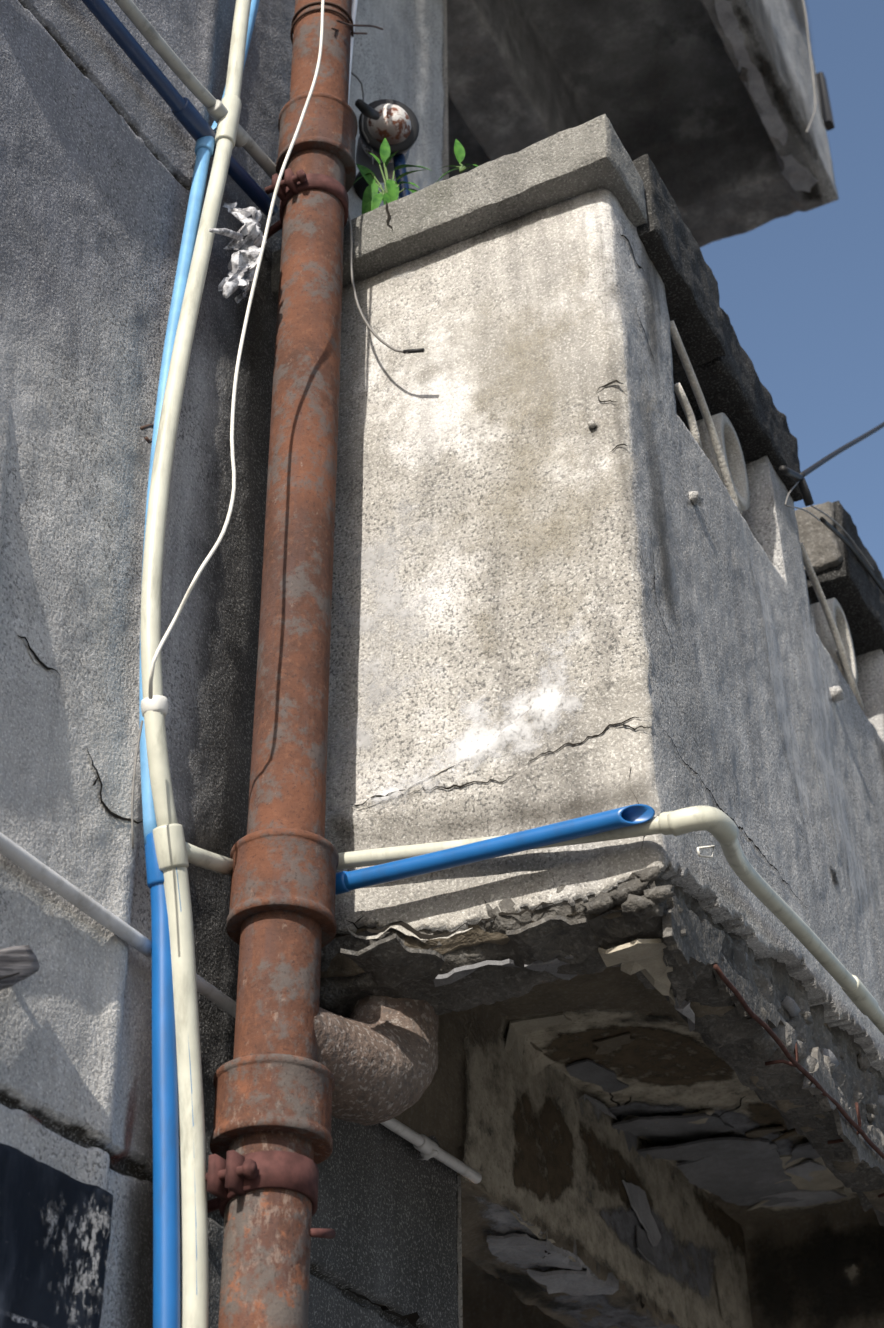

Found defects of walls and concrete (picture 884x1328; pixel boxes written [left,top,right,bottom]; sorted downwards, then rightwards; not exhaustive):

water stain [737,0,817,159]
water stain [801,176,821,201]
crack [87,748,142,824]
crack [338,712,802,903]
peeling [319,836,884,1328]
crack [345,1288,420,1328]